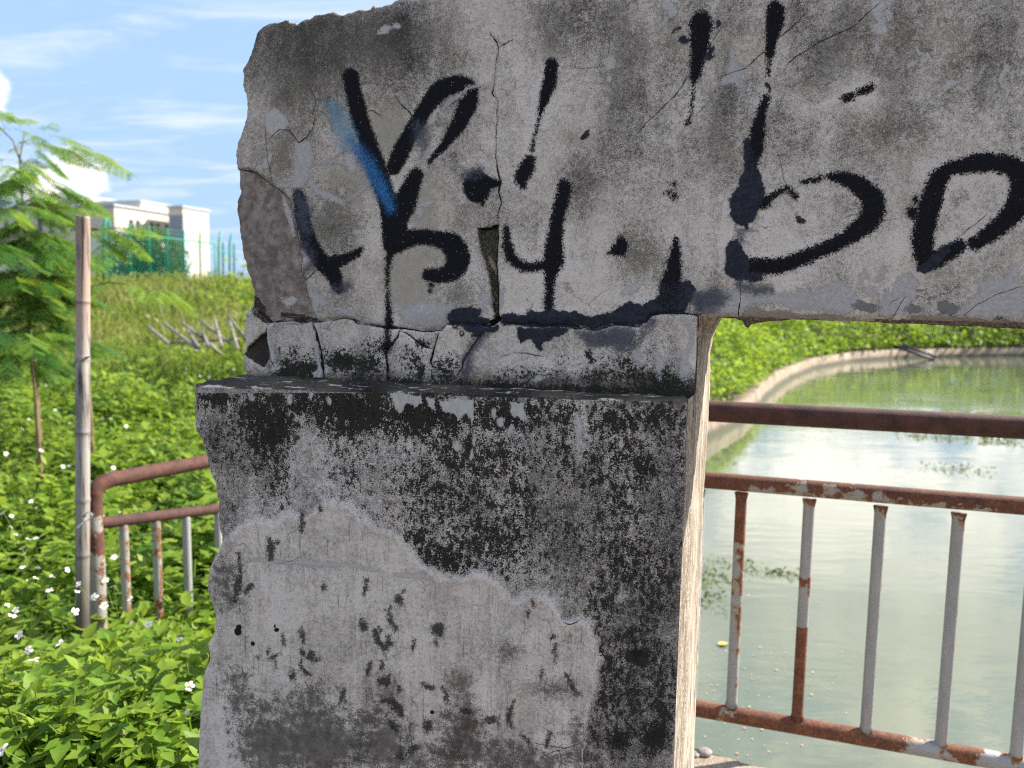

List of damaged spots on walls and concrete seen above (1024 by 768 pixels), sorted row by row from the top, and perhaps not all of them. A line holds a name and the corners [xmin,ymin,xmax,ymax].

crack [241,87,316,246]
crack [490,34,512,219]
crack [634,76,689,137]
spalling [237,152,386,367]
crack [255,271,499,385]
crack [573,304,698,355]
peeling [266,536,280,561]
peeling [251,624,321,680]
peeling [357,571,428,734]
peeling [429,622,446,646]
water stain [196,391,688,768]
peeling [421,681,531,743]